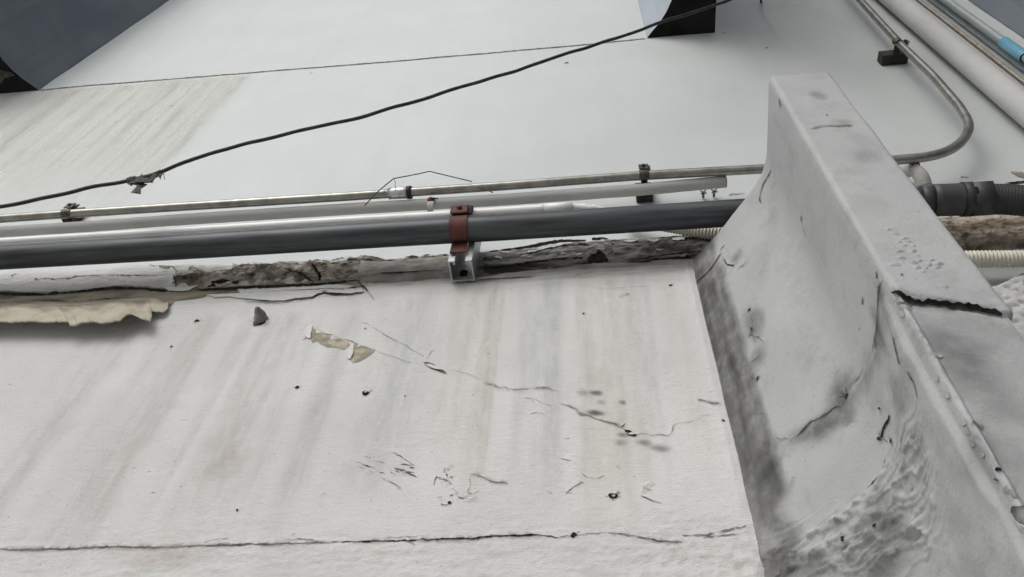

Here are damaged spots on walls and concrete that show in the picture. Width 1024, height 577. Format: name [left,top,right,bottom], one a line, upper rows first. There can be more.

spalling [477,235,711,276]
peeling [0,254,448,327]
crack [245,270,532,301]
peeling [303,324,375,363]
crack [776,274,1002,443]
crack [457,370,721,436]
crack [0,525,746,550]